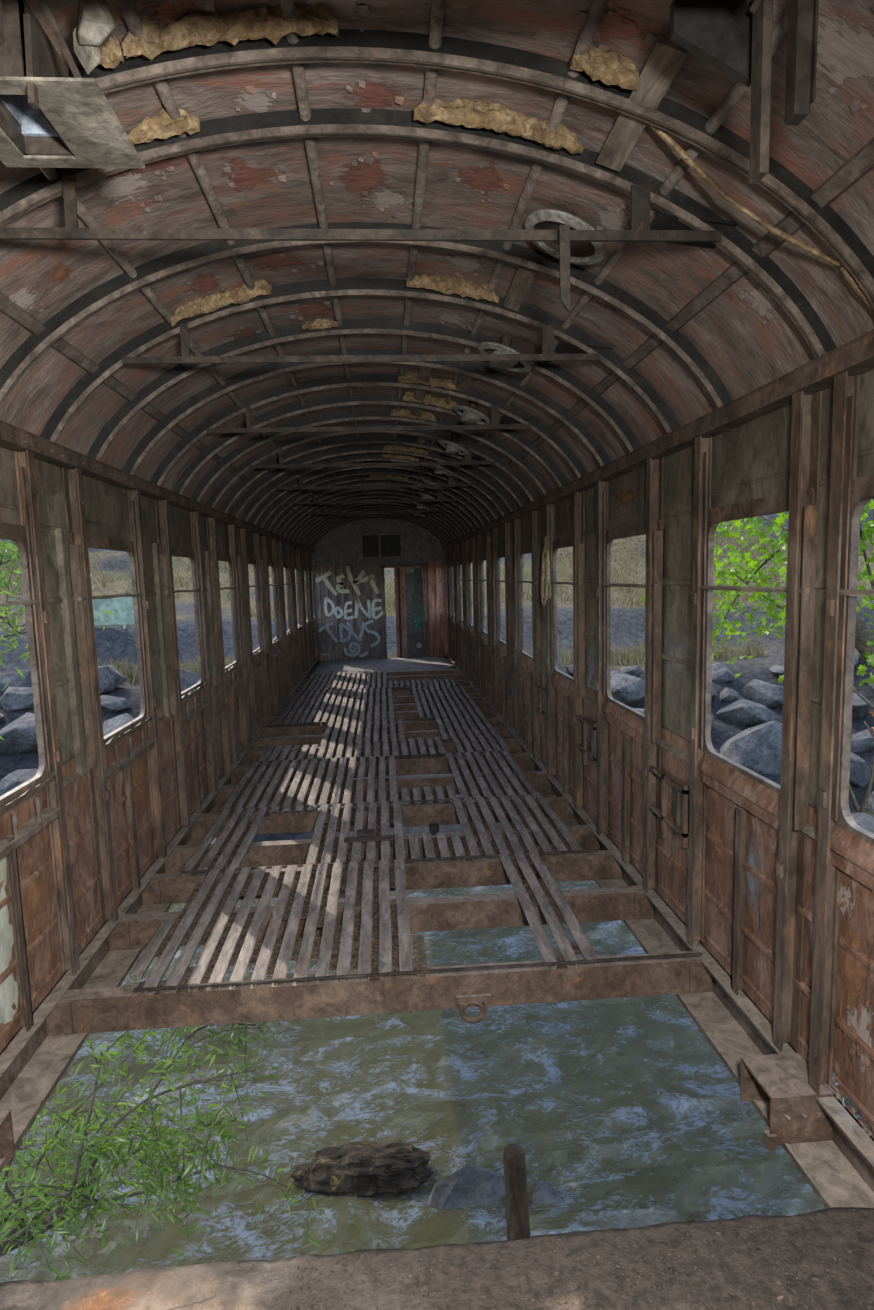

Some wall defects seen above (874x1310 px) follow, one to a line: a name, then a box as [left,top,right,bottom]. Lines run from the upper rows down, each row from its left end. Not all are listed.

peeling [816,3,874,113]
peeling [841,994,874,1073]